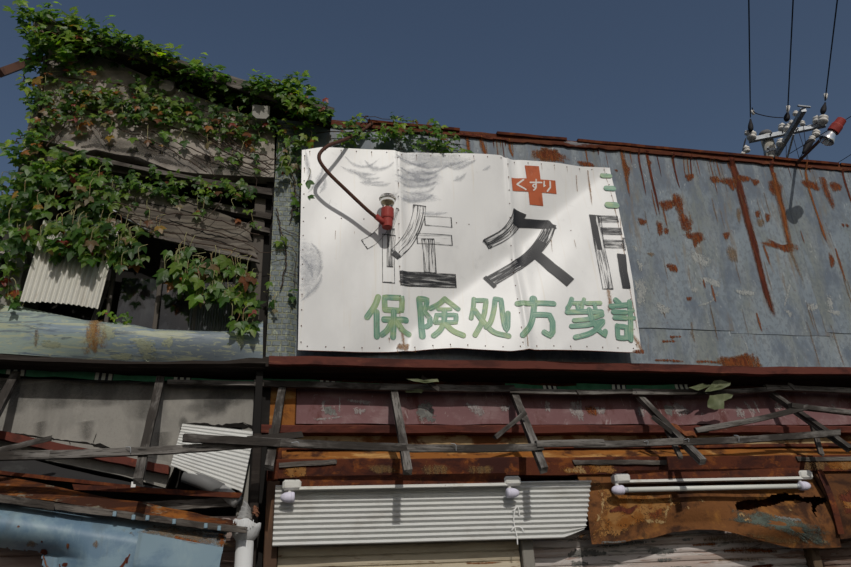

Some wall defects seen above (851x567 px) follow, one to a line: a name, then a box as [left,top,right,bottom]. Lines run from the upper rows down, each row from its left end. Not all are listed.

rust [532,147,568,172]
rust [597,146,805,312]
rust [788,161,851,300]
rust [86,320,105,353]
rust [696,353,761,367]
rust [145,525,226,547]